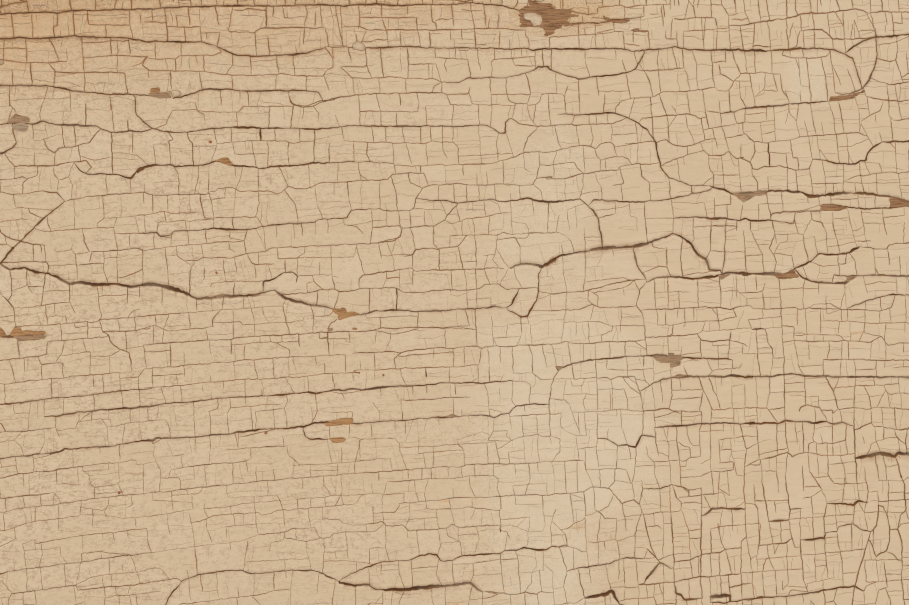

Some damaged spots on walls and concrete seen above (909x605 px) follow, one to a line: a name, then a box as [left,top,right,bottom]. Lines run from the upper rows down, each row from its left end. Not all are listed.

peeling [518,0,584,36]
peeling [0,327,46,341]
peeling [327,307,359,331]
peeling [653,353,685,378]
peeling [323,418,353,426]
crack [469,391,571,419]
crack [331,411,461,504]
crack [451,432,510,483]
crack [191,456,363,542]
crack [366,492,434,532]
crack [445,486,569,509]
crack [0,463,220,605]